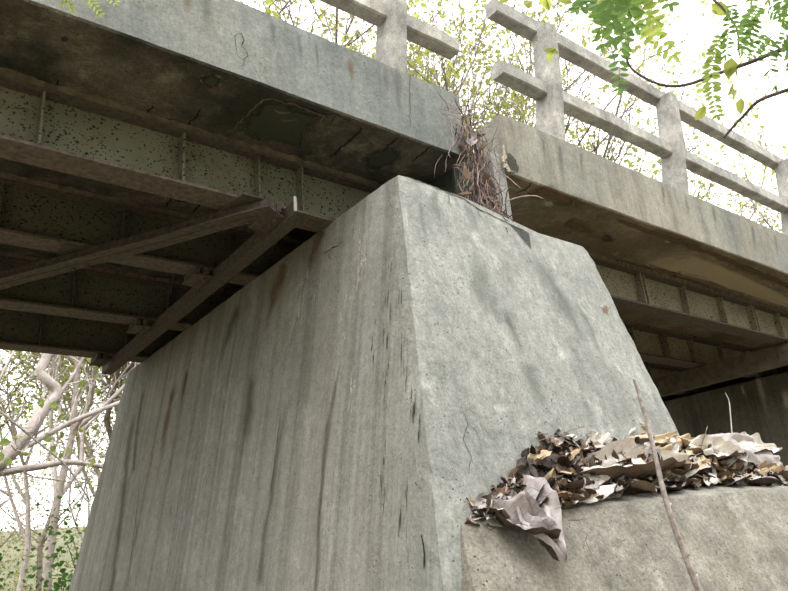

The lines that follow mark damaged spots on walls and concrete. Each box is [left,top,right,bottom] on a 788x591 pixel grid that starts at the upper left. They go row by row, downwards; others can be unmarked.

water stain [315,385,336,589]